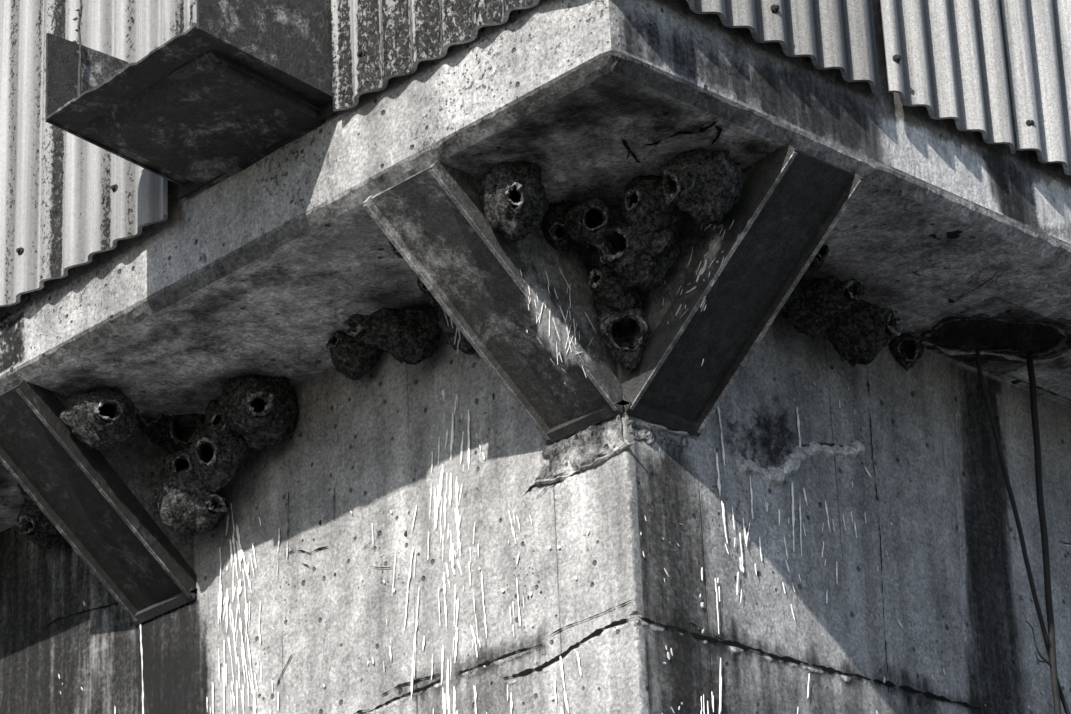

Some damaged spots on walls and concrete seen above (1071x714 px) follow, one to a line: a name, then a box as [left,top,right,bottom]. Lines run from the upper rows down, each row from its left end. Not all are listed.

crack [285,491,328,567]
crack [354,364,983,714]
damp [636,448,735,714]
damp [716,406,807,602]
damp [822,500,866,579]